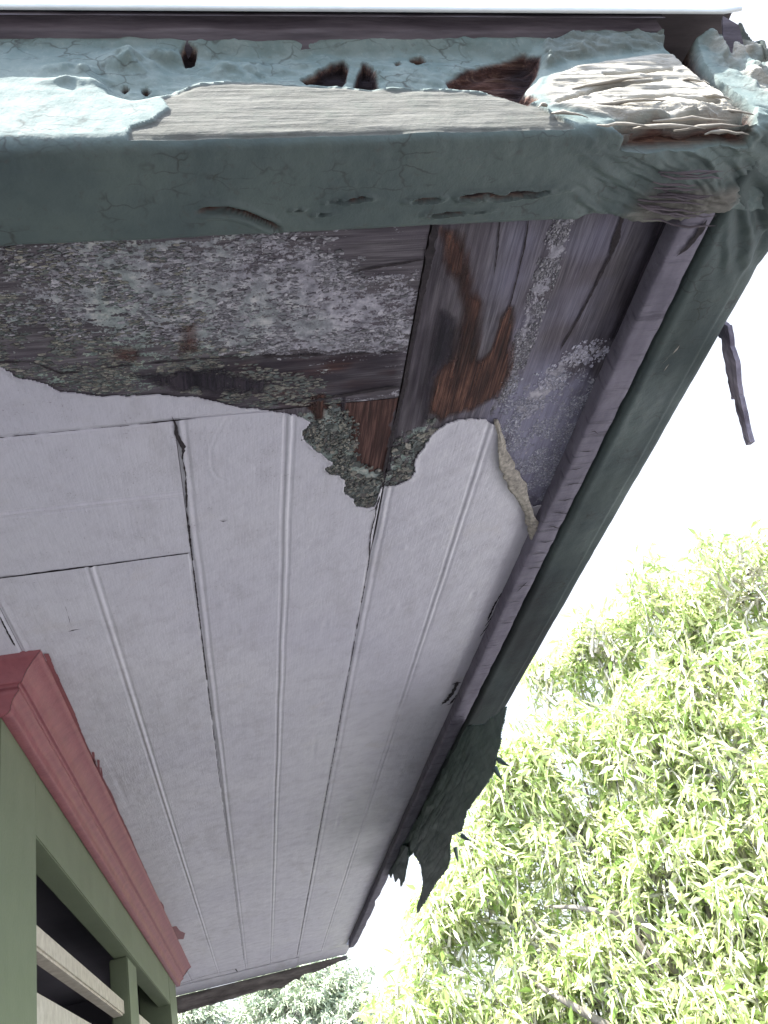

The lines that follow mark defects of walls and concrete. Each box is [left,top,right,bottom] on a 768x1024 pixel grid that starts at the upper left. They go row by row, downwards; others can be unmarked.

peeling [126,52,575,141]
damp [137,369,267,394]
damp [311,394,325,420]
peeling [0,213,658,540]
crack [0,225,438,984]
peeling [389,706,510,913]